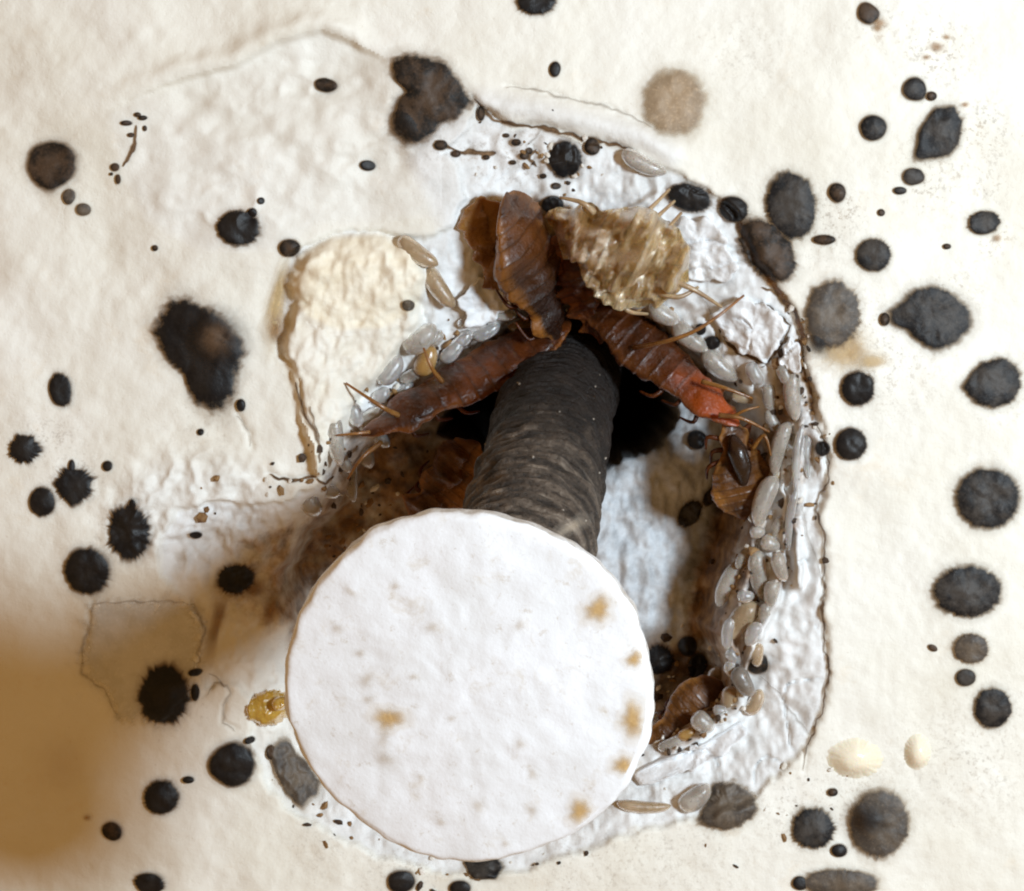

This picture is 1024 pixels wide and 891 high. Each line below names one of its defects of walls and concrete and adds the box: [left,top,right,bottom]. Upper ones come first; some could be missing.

water stain [433,140,461,157]
water stain [503,133,533,165]
spalling [86,29,830,875]